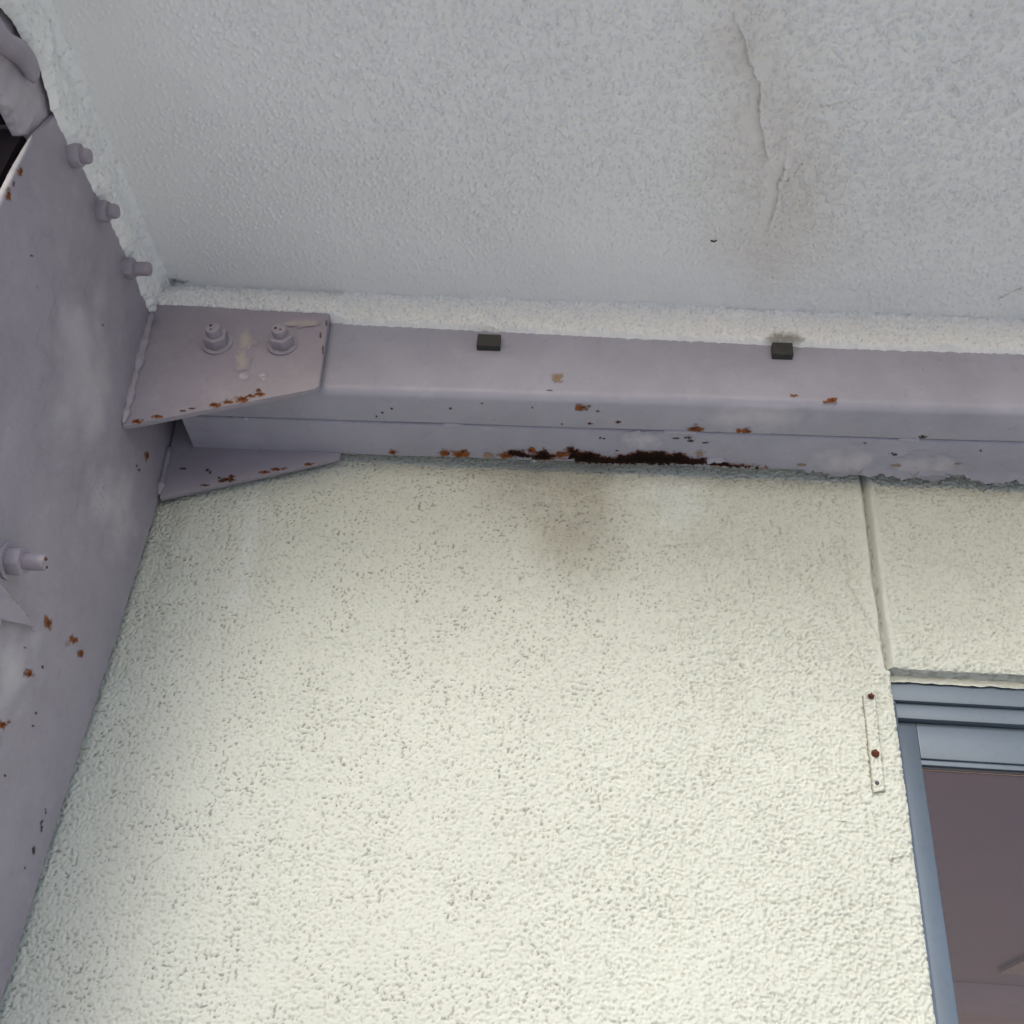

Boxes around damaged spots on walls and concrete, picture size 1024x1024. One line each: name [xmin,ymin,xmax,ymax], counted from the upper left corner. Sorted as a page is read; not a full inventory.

crack [740,32,803,221]
corrosion [210,388,265,408]
corrosion [484,427,768,469]